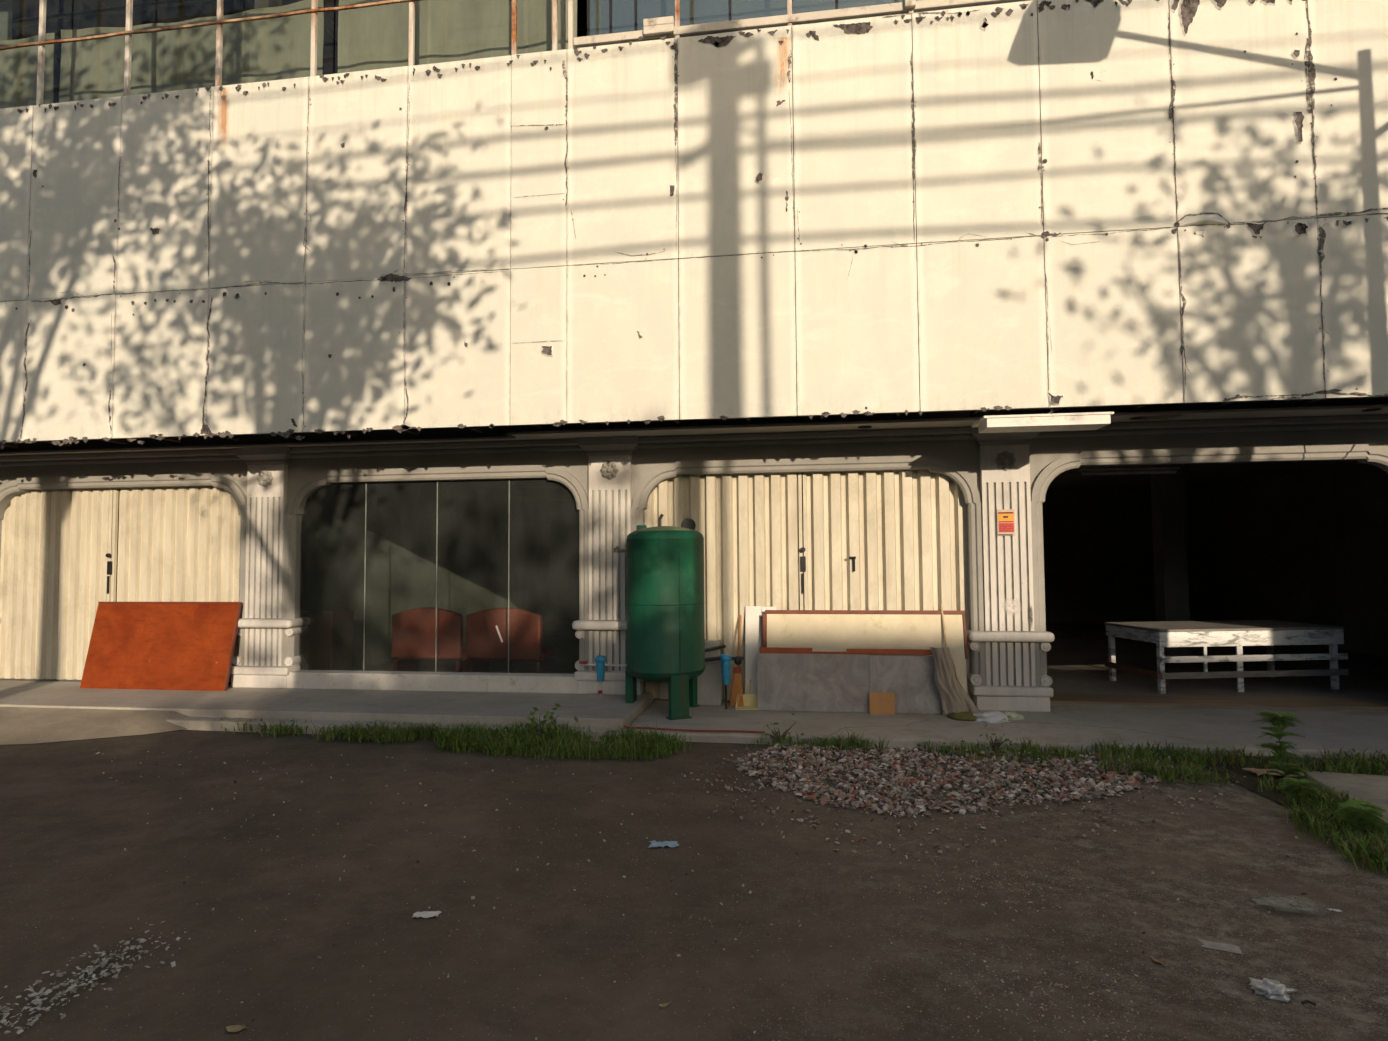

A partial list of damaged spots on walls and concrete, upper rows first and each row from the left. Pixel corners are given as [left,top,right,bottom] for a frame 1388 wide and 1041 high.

peeling [834,0,1132,34]
peeling [1158,0,1229,36]
peeling [574,36,642,62]
peeling [698,29,789,47]
spalling [1292,111,1305,178]